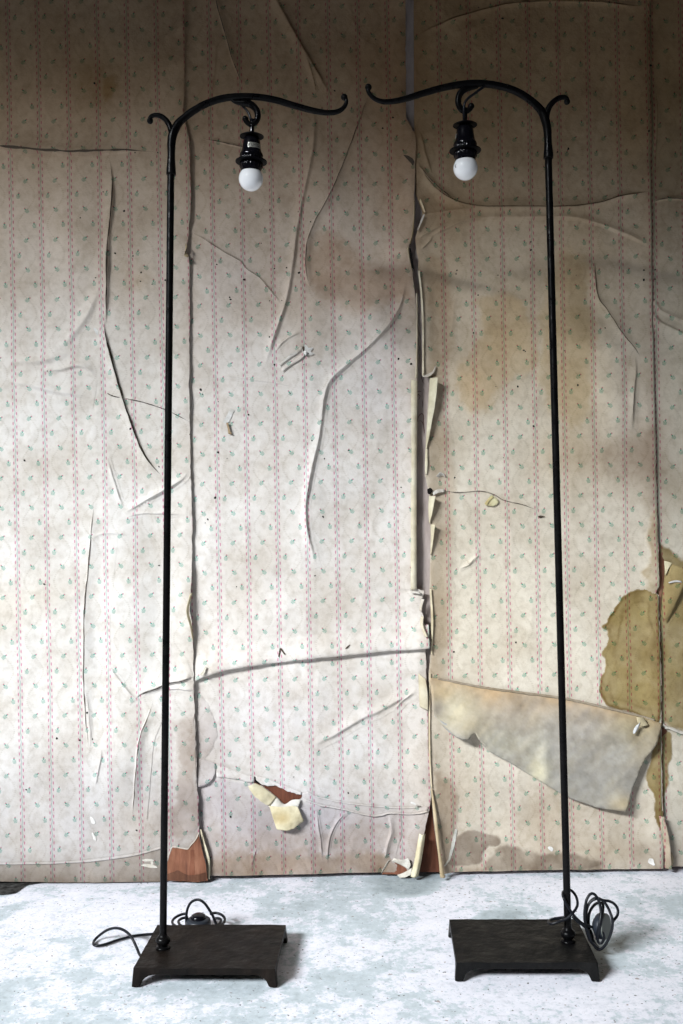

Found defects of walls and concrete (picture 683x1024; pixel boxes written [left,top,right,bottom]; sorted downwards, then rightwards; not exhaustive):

peeling [407,199,446,654]
leakage [595,425,683,830]
peeling [142,829,210,882]
spalling [248,777,304,831]
peeling [267,673,662,955]